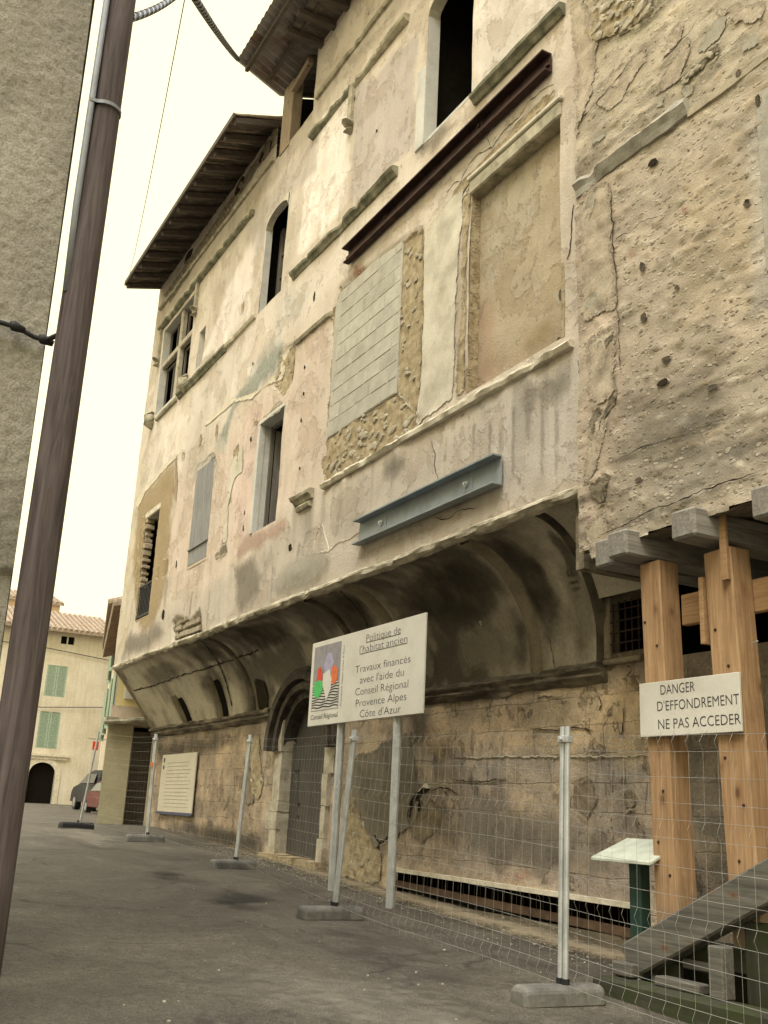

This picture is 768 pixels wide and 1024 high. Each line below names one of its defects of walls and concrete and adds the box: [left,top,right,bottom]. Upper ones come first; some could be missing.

flaking render [568,0,654,136]
flaking render [321,189,463,481]
crack [617,418,727,460]
crack [600,468,766,535]
crack [134,641,259,706]
peeling [340,733,443,884]
crack [407,696,648,822]